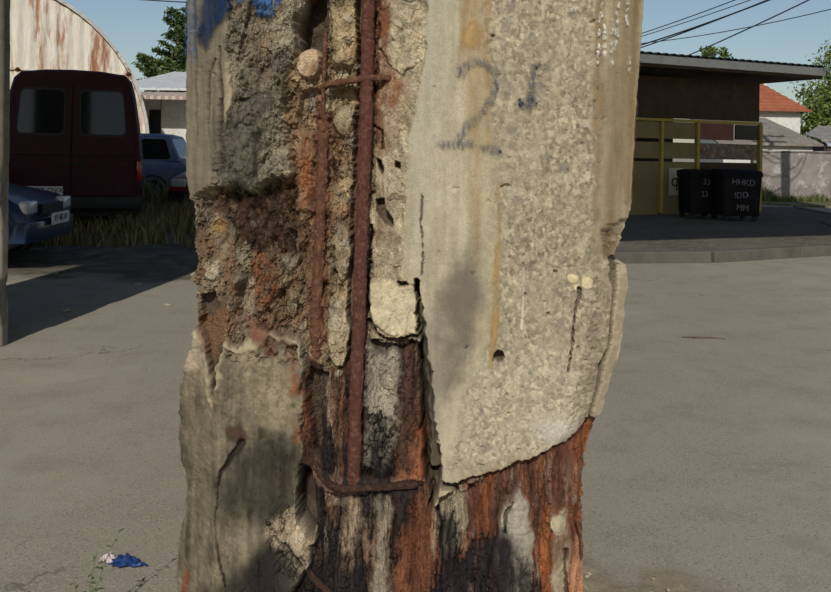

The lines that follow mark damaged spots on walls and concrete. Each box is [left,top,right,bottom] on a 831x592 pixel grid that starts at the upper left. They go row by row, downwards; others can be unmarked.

crack [374,125,385,150]
rust [374,0,389,145]
spalling [180,0,628,592]
crack [367,194,572,549]
crack [566,286,583,373]
crack [585,255,619,421]
crack [214,439,246,514]
rust [514,419,590,592]